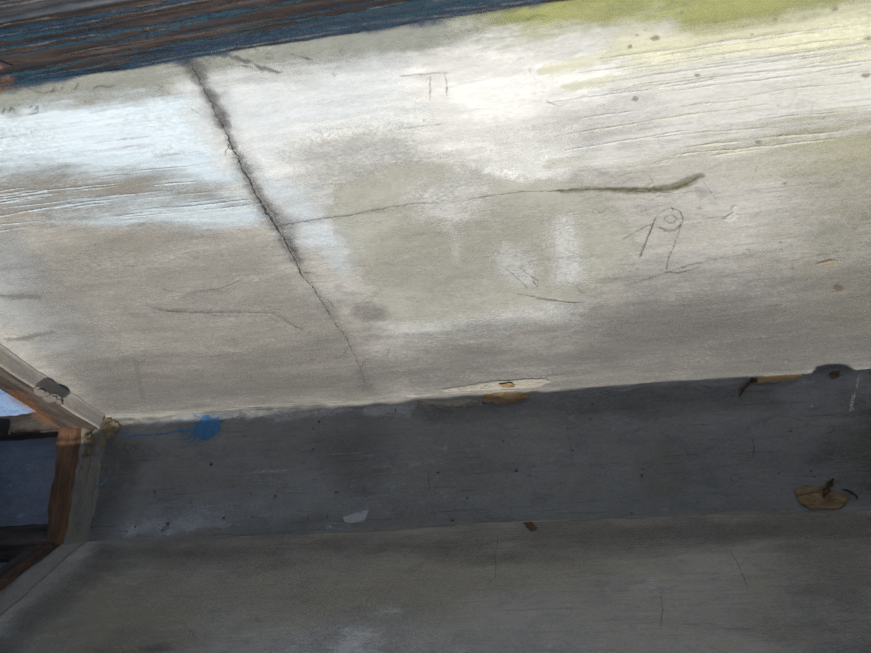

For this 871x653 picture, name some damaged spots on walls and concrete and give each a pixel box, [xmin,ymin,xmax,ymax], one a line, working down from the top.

water stain [0,0,533,112]
water stain [539,8,871,137]
crack [183,59,426,385]
crack [448,176,703,204]
water stain [545,112,871,174]